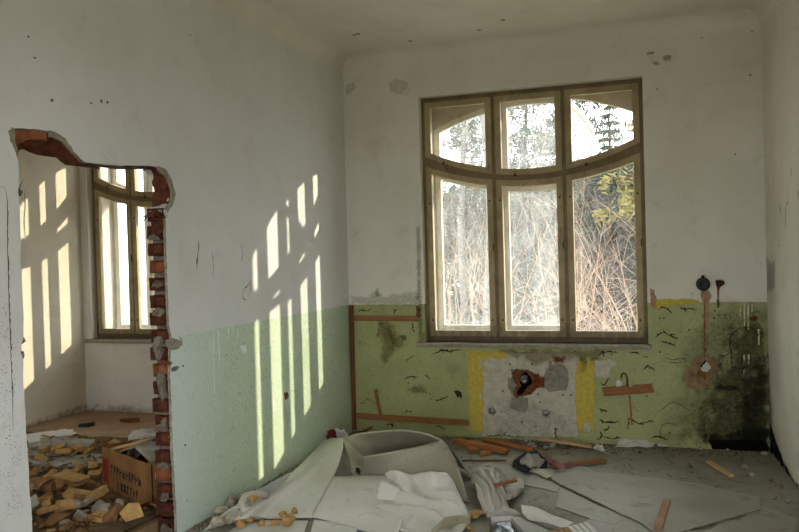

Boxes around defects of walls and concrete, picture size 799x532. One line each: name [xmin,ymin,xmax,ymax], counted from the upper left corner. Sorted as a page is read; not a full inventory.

spalling [8,127,186,532]
flaking render [479,351,591,438]
flaking render [697,360,711,380]
damp [699,303,799,488]